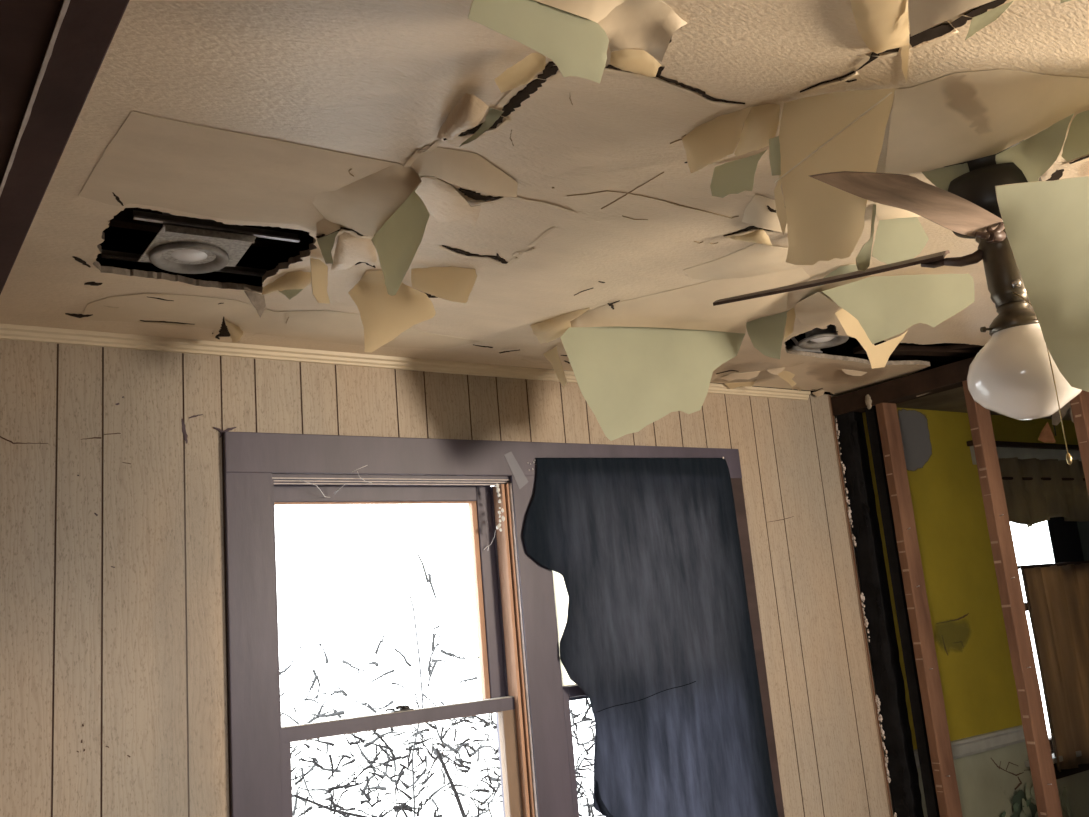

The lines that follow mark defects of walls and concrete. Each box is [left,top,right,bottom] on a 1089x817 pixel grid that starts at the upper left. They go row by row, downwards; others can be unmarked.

peeling [244,176,481,353]
crack [403,61,573,168]
peeling [467,0,662,93]
crack [439,134,776,266]
crack [603,27,745,108]
peeling [682,89,974,369]
peeling [850,0,909,82]
crack [800,0,1017,95]
peeling [965,1,1014,40]
peeling [995,110,1089,392]
crack [1046,155,1089,181]
peeling [530,307,797,441]